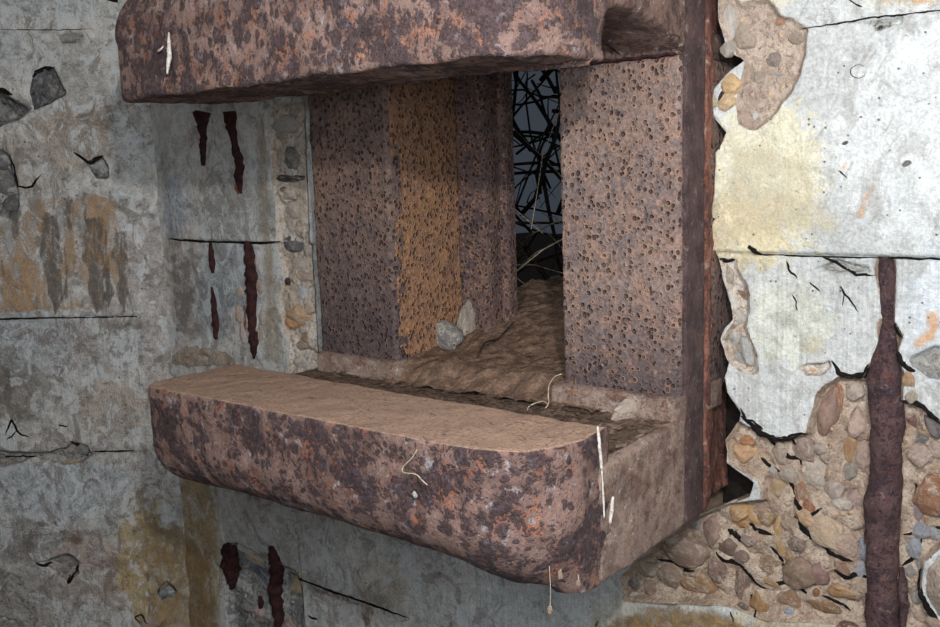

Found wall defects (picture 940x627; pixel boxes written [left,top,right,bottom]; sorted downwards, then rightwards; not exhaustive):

crack [799,0,940,30]
spalling [0,67,66,127]
spalling [713,0,808,130]
spalling [0,150,19,217]
crack [719,245,940,312]
spalling [620,257,940,627]